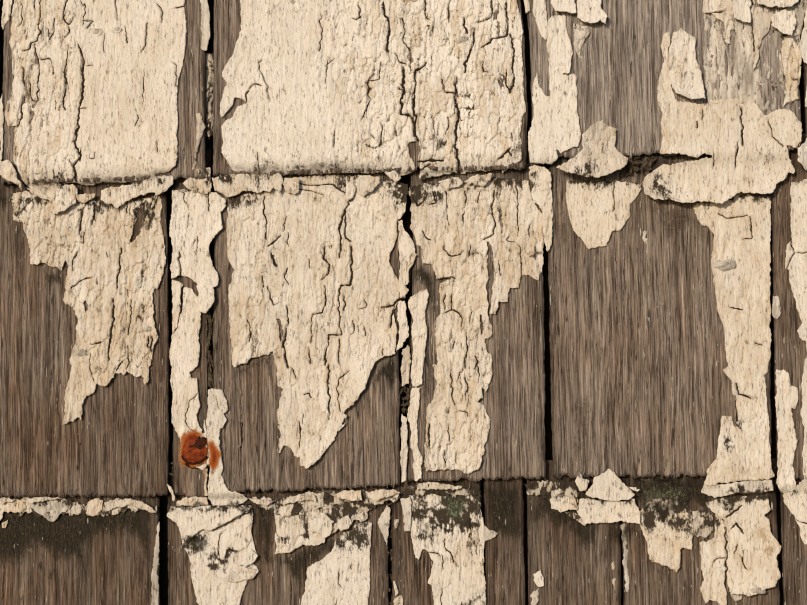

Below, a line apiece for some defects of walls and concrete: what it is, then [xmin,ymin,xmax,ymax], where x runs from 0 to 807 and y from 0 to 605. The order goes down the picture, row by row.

crack [10,0,105,181]
crack [362,2,425,142]
crack [417,1,515,175]
crack [261,183,367,413]
peeling [0,0,628,605]
crack [387,297,409,327]
crack [440,277,480,416]
crack [413,189,530,275]
peeling [525,0,807,605]
rust [179,429,221,479]
crack [237,377,245,476]
crack [428,424,456,465]